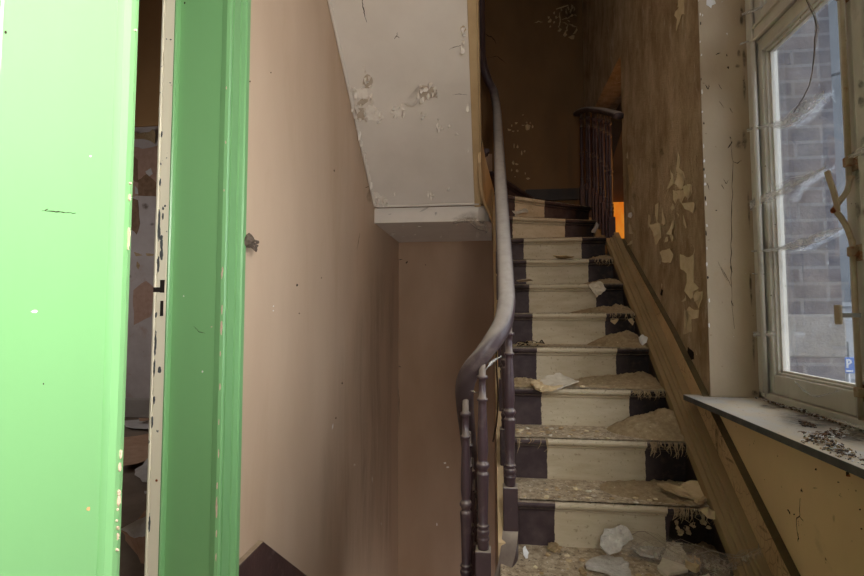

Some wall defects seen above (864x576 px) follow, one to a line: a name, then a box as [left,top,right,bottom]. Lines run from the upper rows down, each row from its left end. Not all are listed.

peeling [133,281,157,325]
peeling [127,129,167,276]
peeling [648,153,703,334]